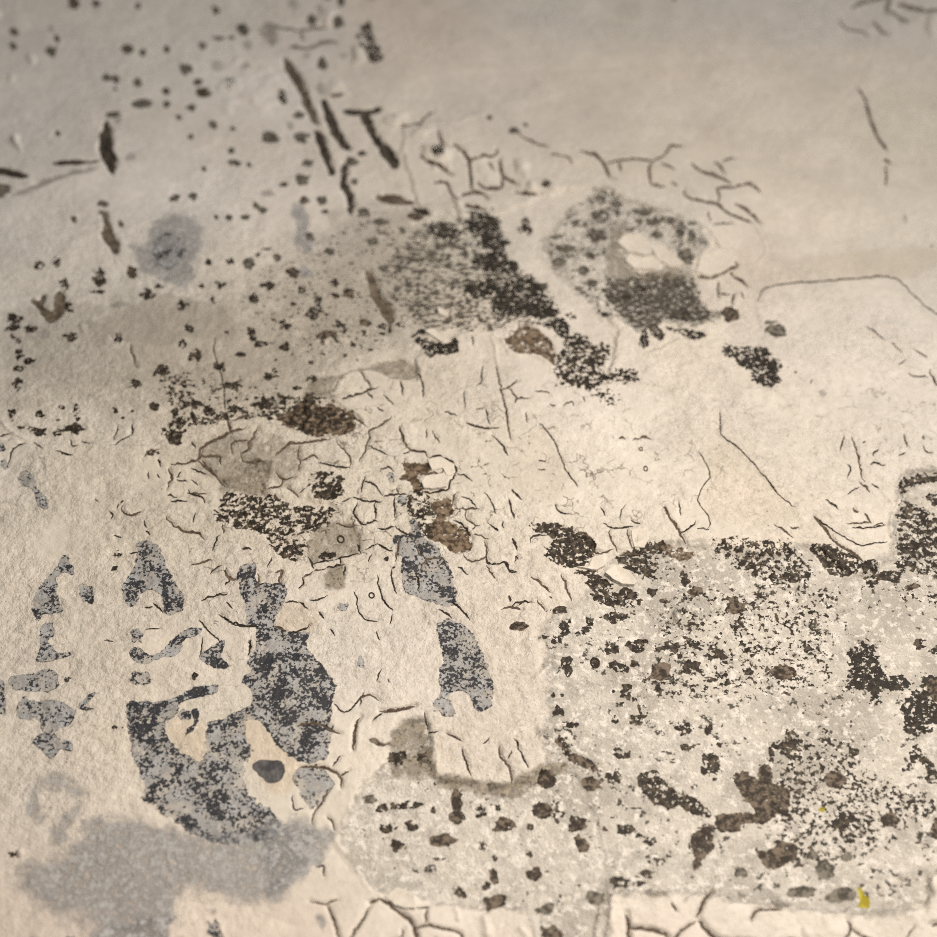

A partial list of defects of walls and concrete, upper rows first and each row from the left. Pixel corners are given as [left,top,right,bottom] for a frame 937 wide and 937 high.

spalling [365,264,394,324]
peeling [424,328,447,343]
flaking render [540,187,735,333]
crack [95,340,585,655]
crack [663,452,711,544]
crack [720,410,932,562]
water stain [122,540,184,615]
water stain [0,555,96,759]
water stain [16,563,336,937]
flaking render [340,465,937,937]
crack [310,898,463,937]
crack [625,891,716,937]